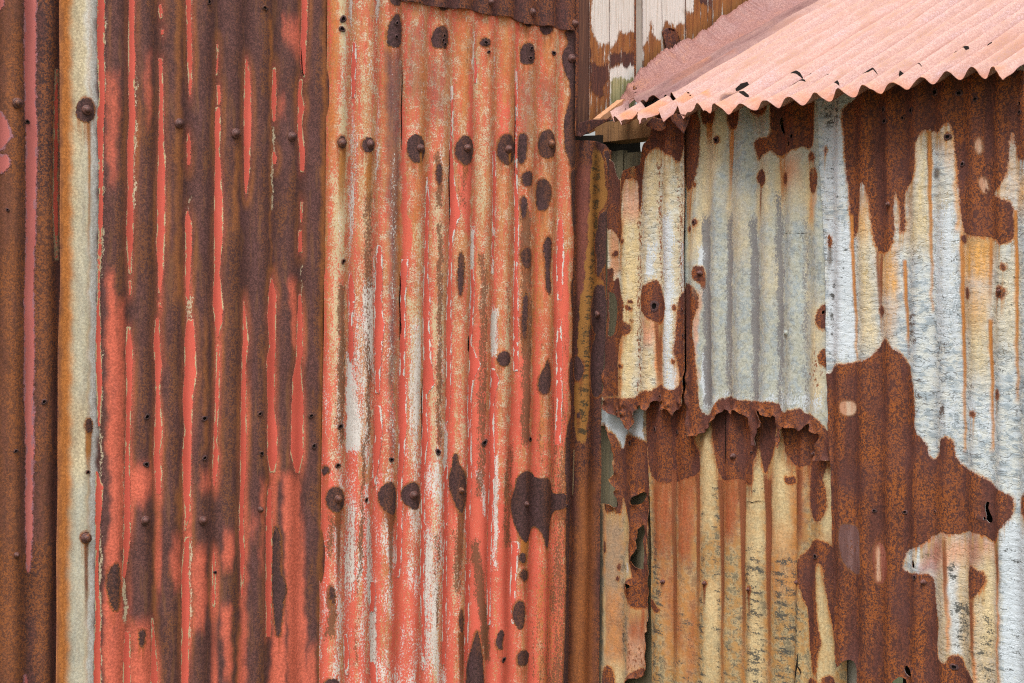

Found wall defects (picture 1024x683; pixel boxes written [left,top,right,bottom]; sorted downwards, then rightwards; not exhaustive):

corrosion [386,0,403,48]
corrosion [430,25,449,49]
corrosion [455,135,474,166]
corrosion [496,23,576,230]
corrosion [568,70,1024,683]
corrosion [510,412,581,683]
corrosion [105,563,122,612]
corrosion [271,525,288,638]
corrosion [138,628,146,648]